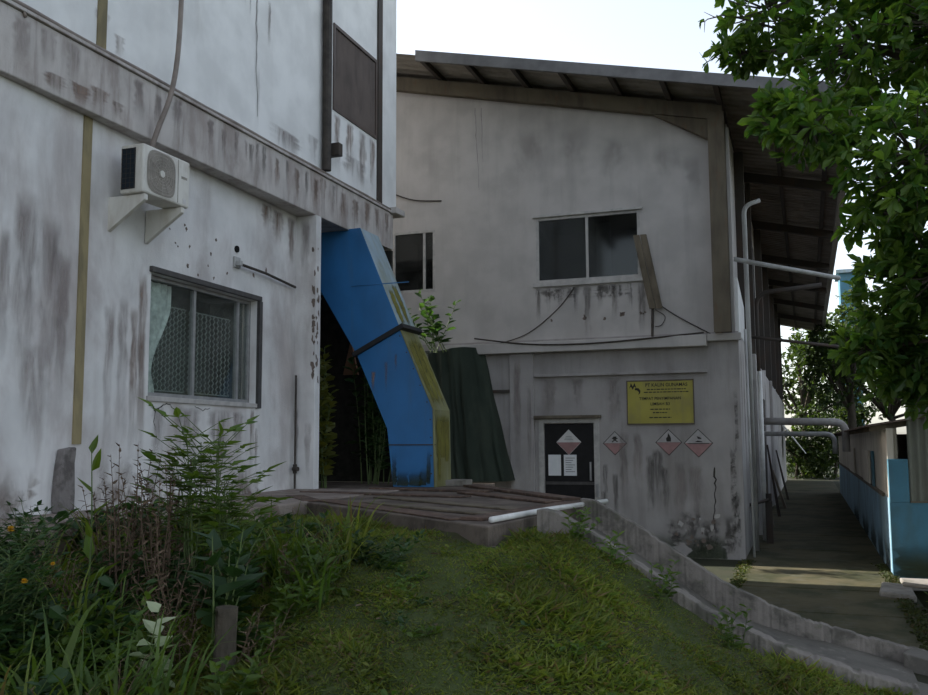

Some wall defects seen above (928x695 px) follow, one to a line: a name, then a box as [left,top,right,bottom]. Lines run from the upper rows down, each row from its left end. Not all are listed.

leakage [74,83,105,98]
leakage [49,239,68,328]
spalling [310,266,320,382]
leakage [687,496,740,559]
leakage [854,509,928,578]